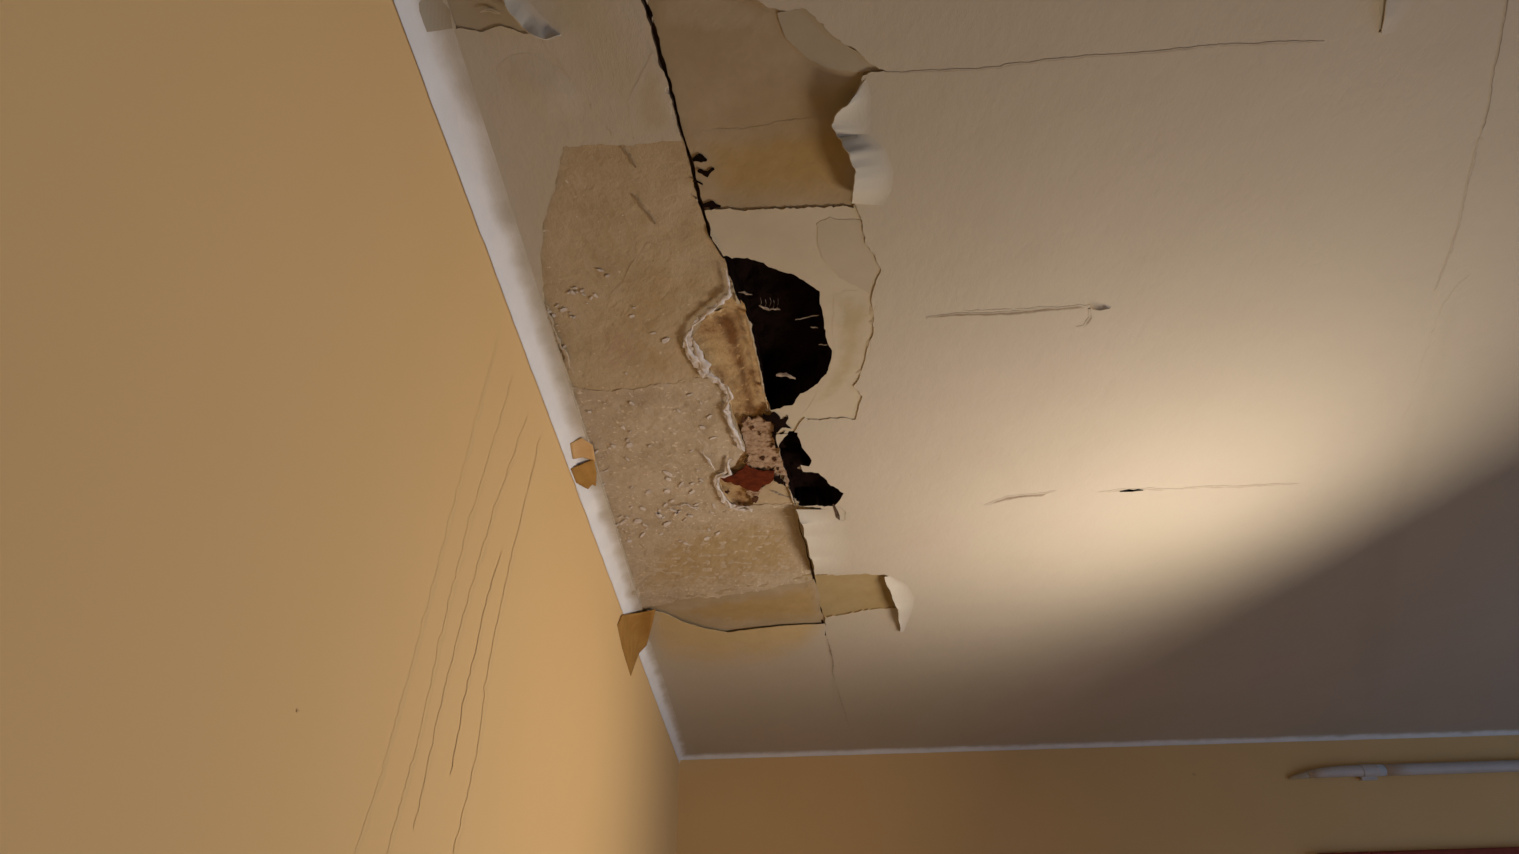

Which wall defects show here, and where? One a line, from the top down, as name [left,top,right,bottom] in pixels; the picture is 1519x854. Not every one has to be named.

peeling [419,0,561,40]
crack [641,0,724,259]
leakage [528,0,855,208]
crack [886,41,1325,74]
crack [1435,0,1509,291]
peeling [540,0,915,679]
crack [926,300,1112,329]
rust [721,464,775,492]
crack [798,518,852,731]